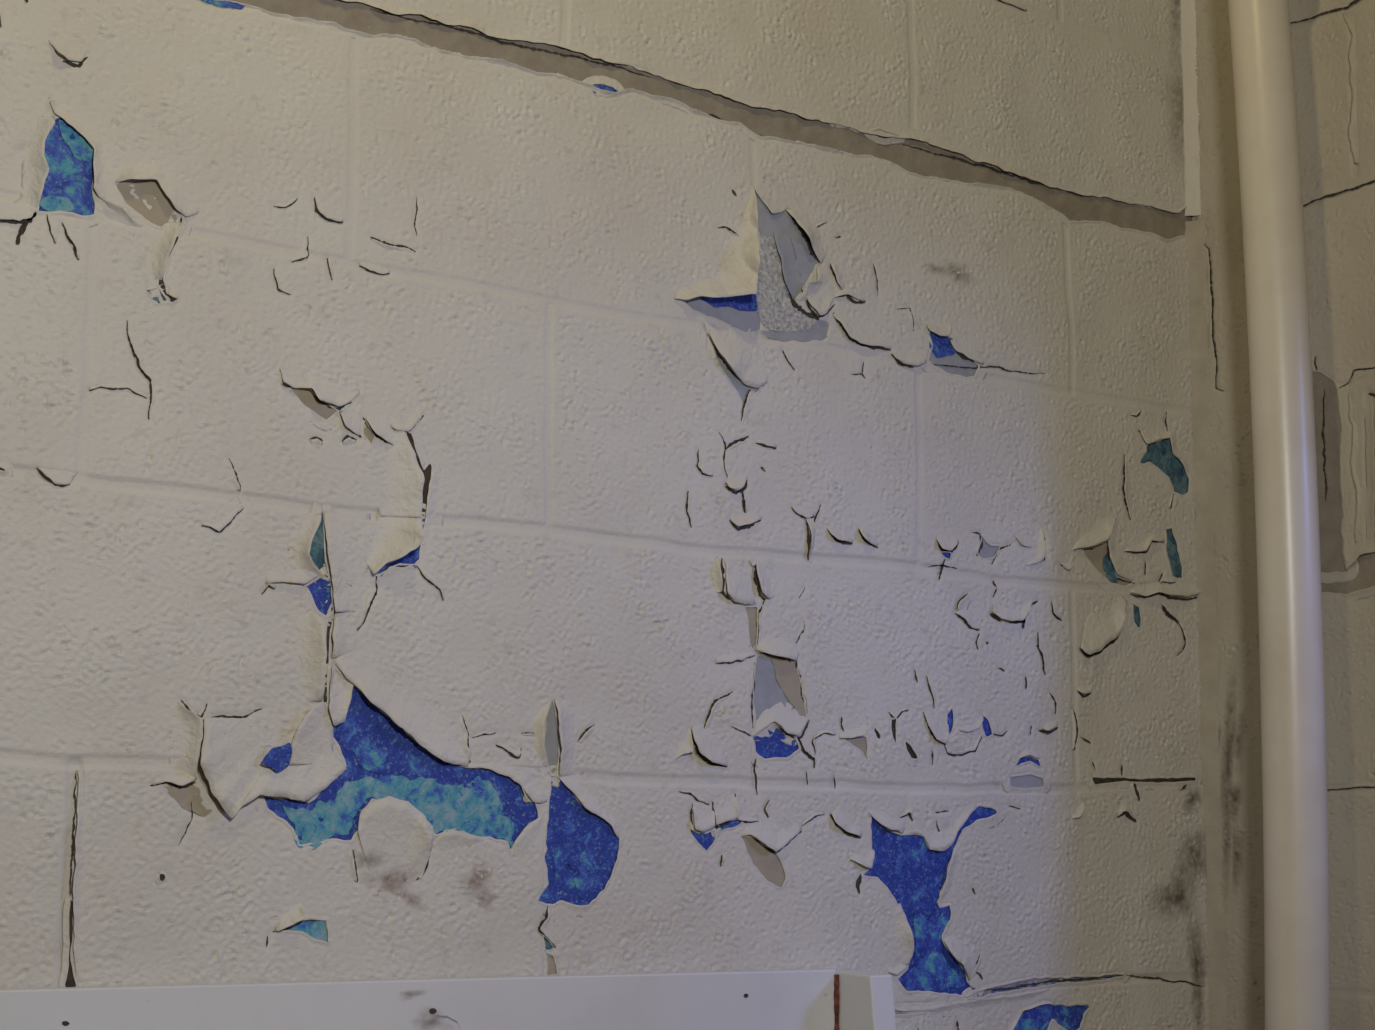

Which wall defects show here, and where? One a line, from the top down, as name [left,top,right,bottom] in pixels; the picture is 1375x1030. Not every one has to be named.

peeling [48,35,88,67]
peeling [0,97,199,310]
crack [370,8,651,78]
peeling [202,0,1192,239]
peeling [675,178,1044,380]
crack [902,144,1083,197]
crack [1290,0,1359,24]
crack [1303,171,1375,206]
crack [1314,356,1375,501]
peeling [150,367,630,976]
peeling [674,406,1201,1030]
crack [59,770,92,987]